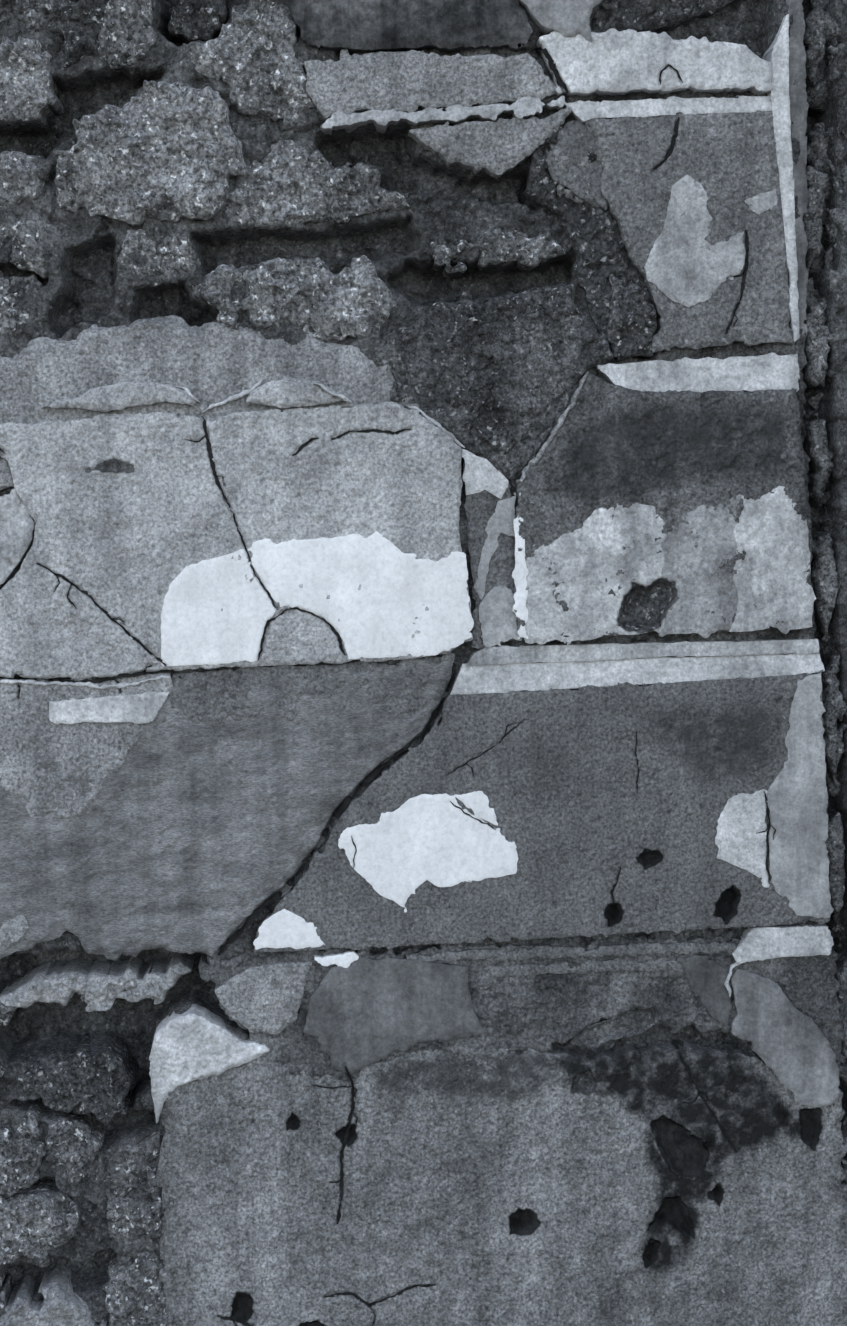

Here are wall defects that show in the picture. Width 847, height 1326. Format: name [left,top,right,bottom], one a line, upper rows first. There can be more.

flaking render [591,0,745,34]
crack [184,416,345,660]
crack [0,563,182,699]
crack [217,681,451,955]
crack [313,1066,358,1224]
crack [219,1316,252,1326]
crack [324,1284,436,1322]